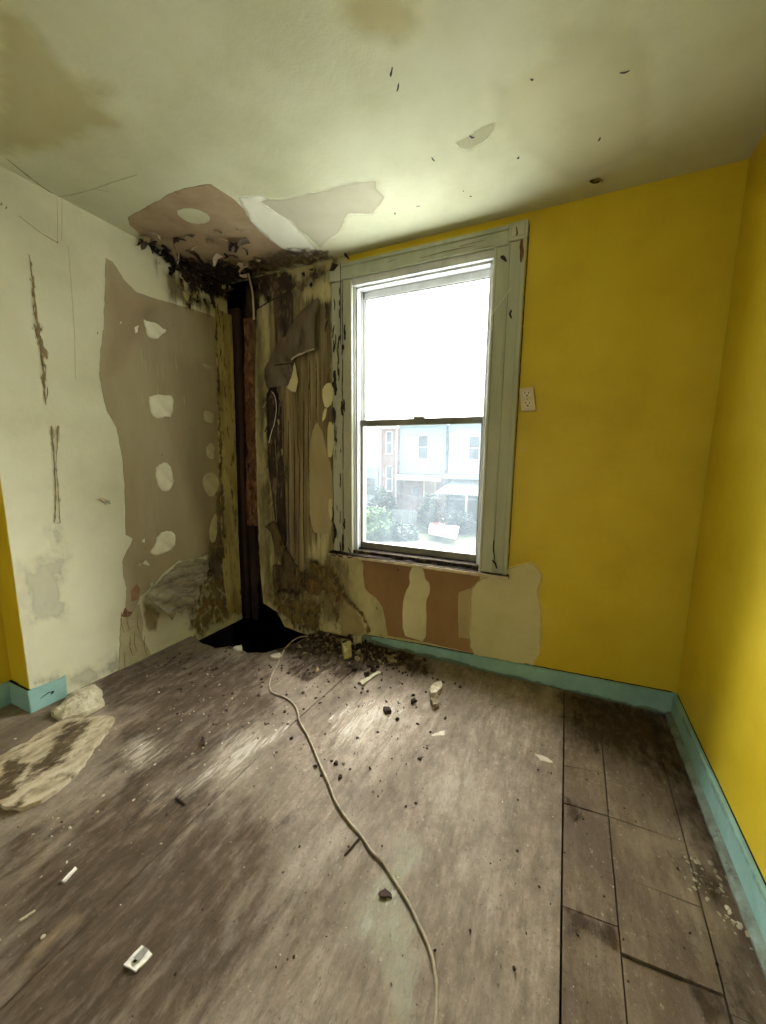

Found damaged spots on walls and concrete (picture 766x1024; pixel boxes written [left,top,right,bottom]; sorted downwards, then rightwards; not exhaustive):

peeling [99,184,305,617]
spalling [199,526,308,653]
leakage [137,182,433,681]
peeling [325,253,350,457]
peeling [329,506,412,561]